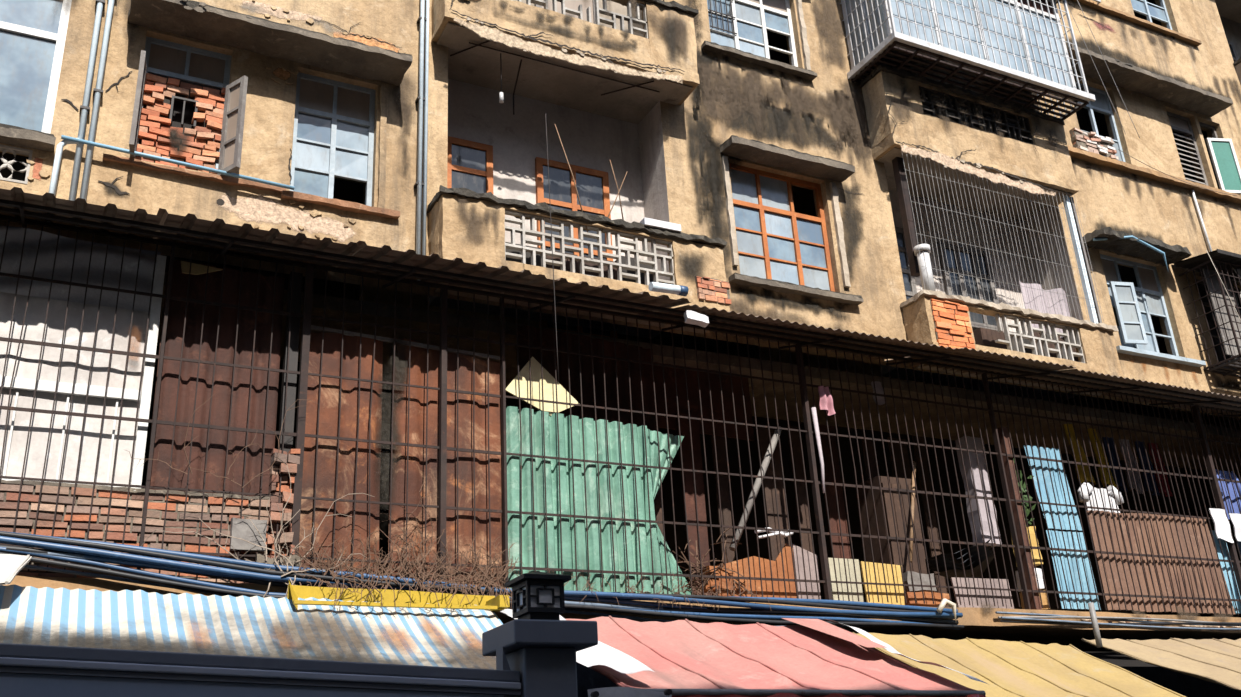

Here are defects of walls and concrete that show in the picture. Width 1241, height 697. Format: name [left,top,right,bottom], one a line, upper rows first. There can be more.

peeling [242,0,322,24]
water stain [500,0,603,34]
peeling [333,32,406,53]
peeling [454,17,682,83]
crack [105,71,132,92]
water stain [631,0,871,280]
peeling [219,194,356,242]
water stain [730,288,849,329]
rust [149,259,285,496]
rust [516,325,657,431]
rust [299,332,503,587]